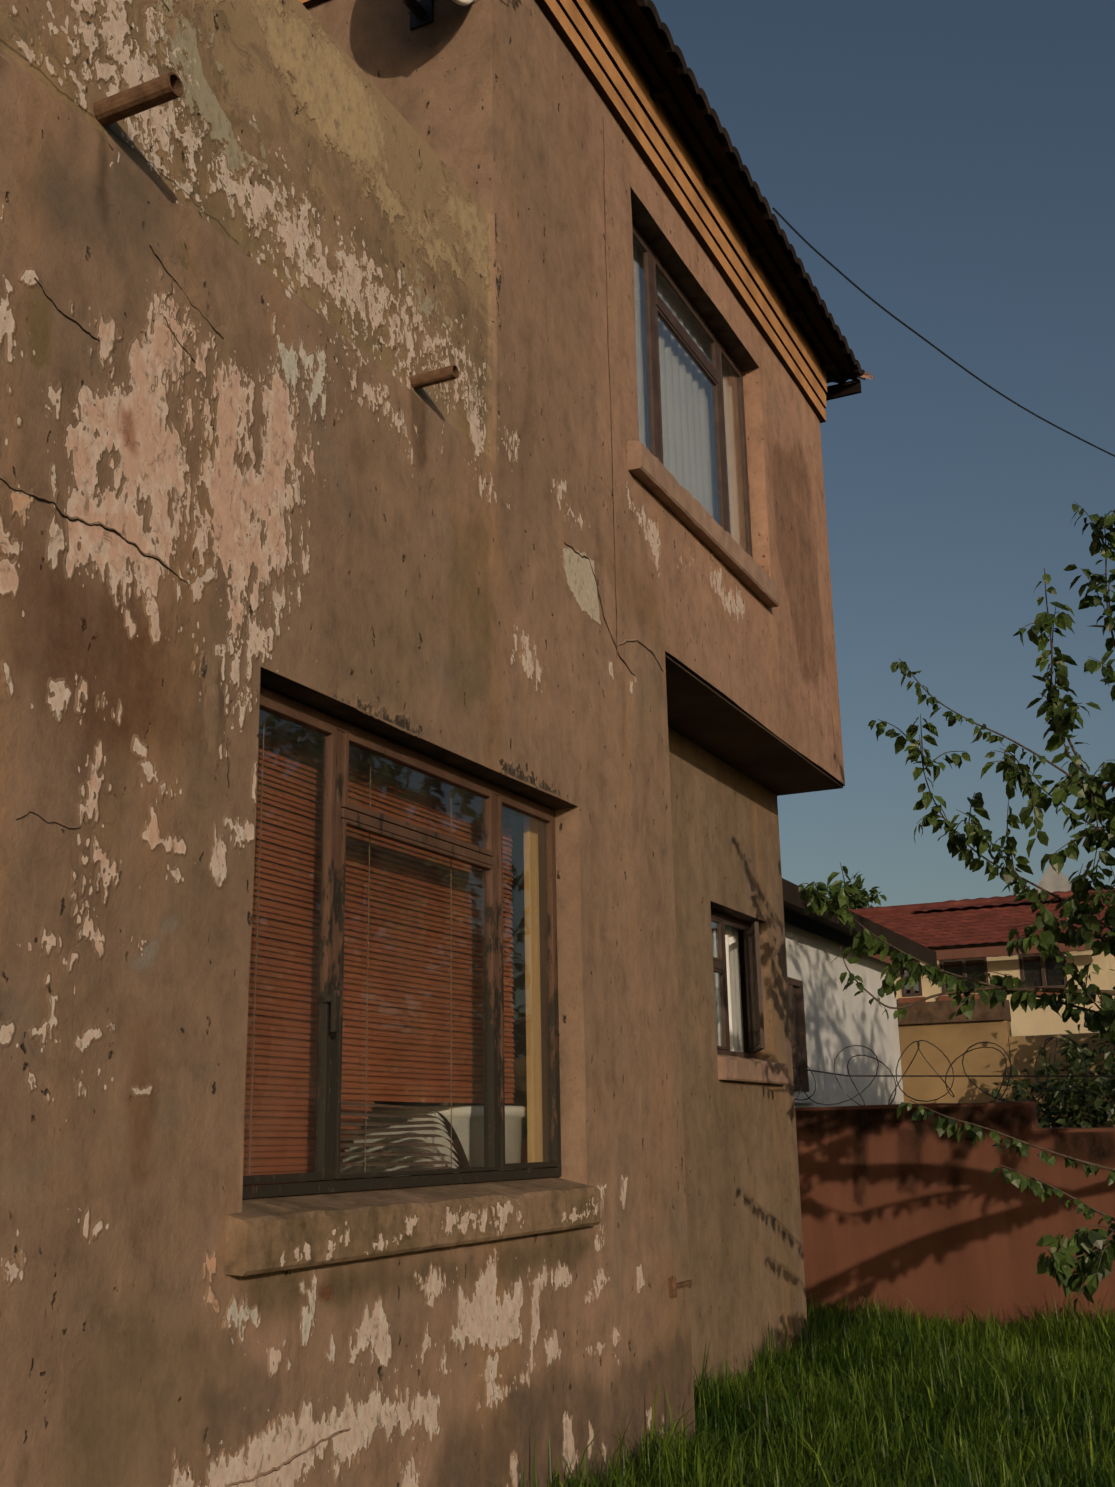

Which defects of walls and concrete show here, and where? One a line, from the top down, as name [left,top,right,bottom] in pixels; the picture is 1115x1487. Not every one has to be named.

crack [34,277,99,341]
crack [149,245,224,363]
peeling [0,0,520,761]
crack [564,116,664,677]
crack [0,475,189,585]
peeling [551,477,603,627]
peeling [626,485,748,624]
peeling [0,739,121,1106]
peeling [1,1229,29,1288]
peeling [78,1206,109,1244]
peeling [168,1173,629,1487]
peeling [635,1262,645,1295]